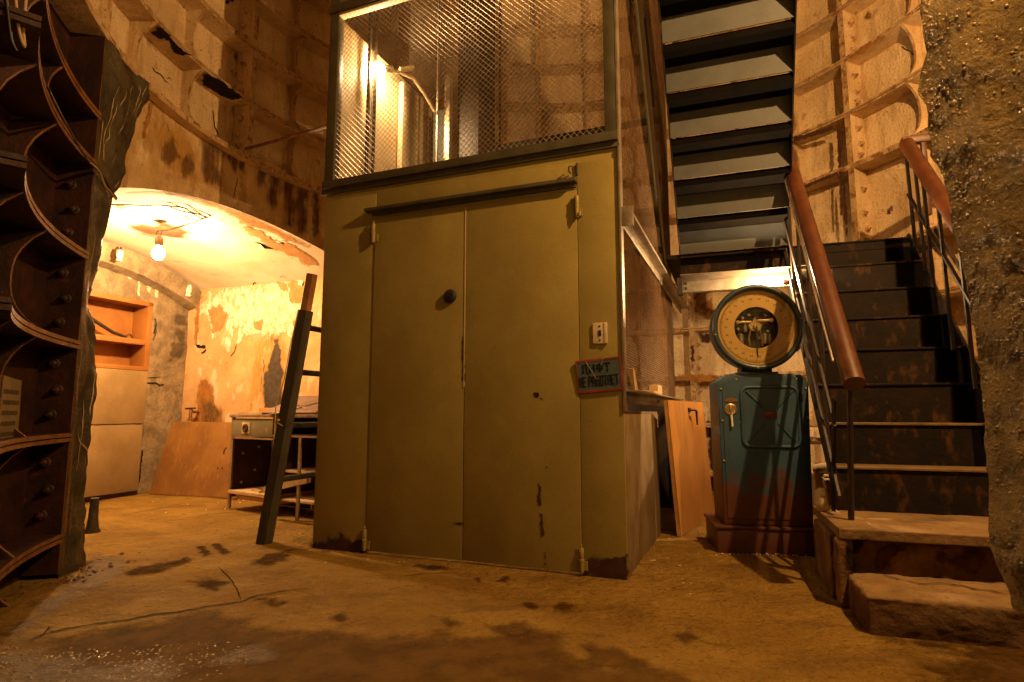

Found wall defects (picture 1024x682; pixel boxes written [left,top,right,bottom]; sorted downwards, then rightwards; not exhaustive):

spalling [151,27,192,56]
spalling [202,74,242,100]
water stain [142,103,245,185]
water stain [130,222,191,238]
peeling [237,222,317,267]
peeling [196,280,304,354]
water stain [250,339,285,408]
corrosion [309,533,366,554]
corrosion [582,554,629,580]
crack [21,567,309,641]